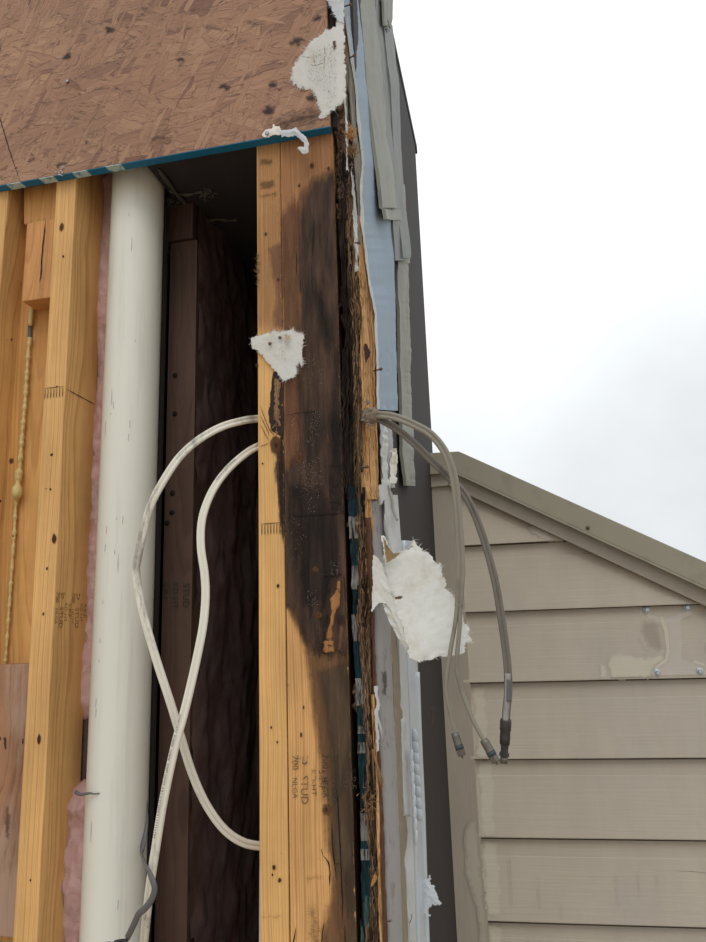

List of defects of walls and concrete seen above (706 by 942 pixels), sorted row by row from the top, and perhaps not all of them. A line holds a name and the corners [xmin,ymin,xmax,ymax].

damp [270,133,362,942]